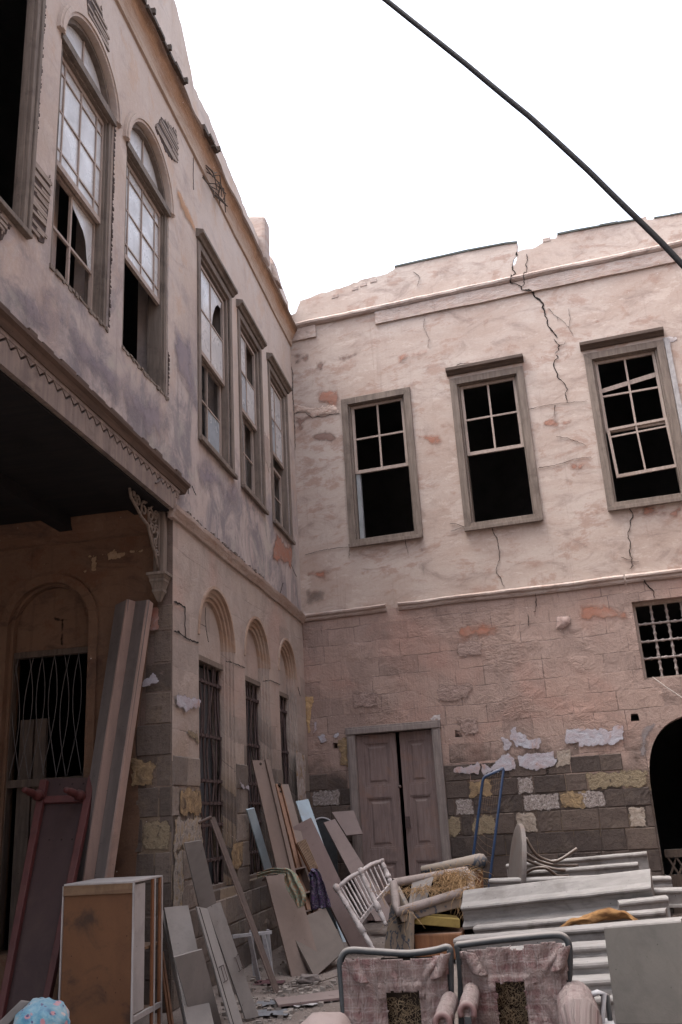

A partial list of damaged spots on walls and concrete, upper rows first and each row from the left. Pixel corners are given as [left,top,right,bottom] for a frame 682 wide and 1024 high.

crack [510,252,584,411]
crack [622,509,655,597]
spalling [448,725,648,837]
spalling [142,787,203,907]